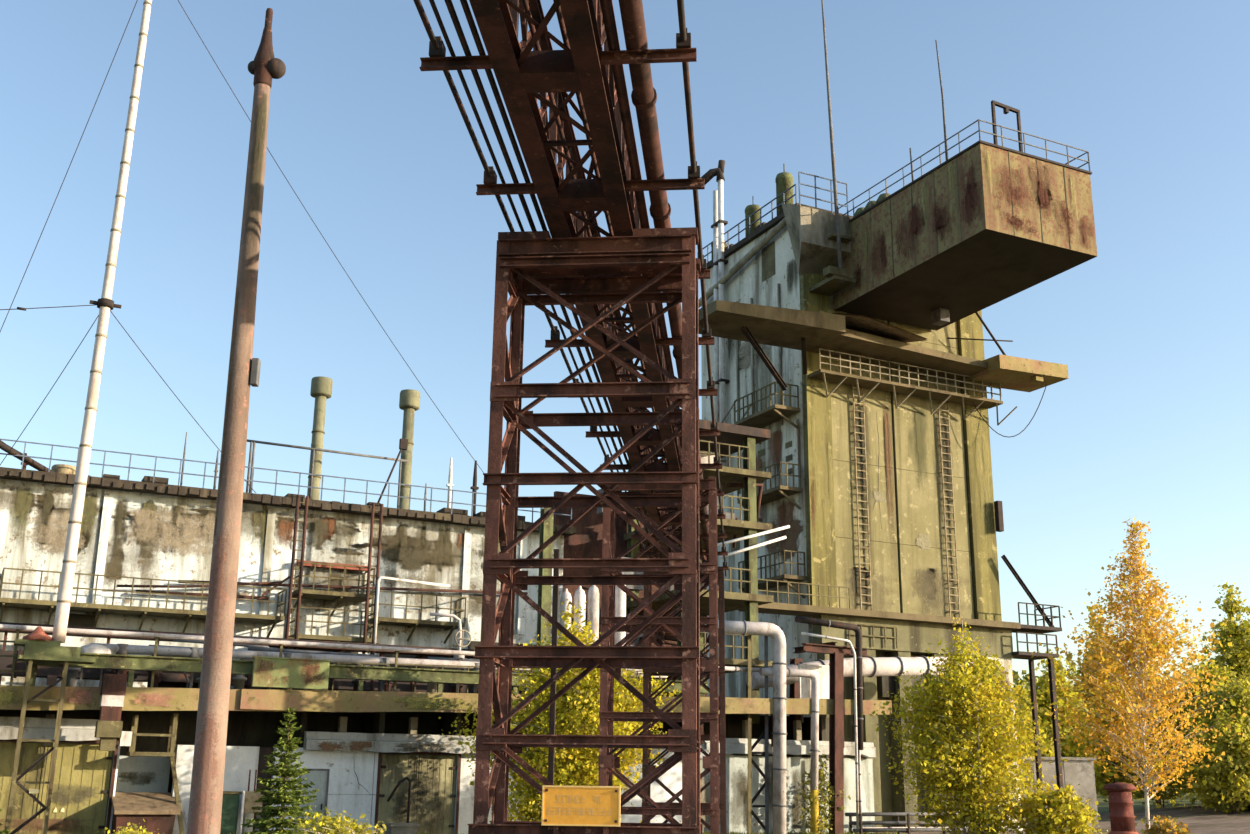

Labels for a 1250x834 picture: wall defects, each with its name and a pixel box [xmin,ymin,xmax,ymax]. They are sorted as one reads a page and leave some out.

damp [221,292,238,474]
corrosion [756,431,782,521]
damp [855,407,869,505]
damp [884,412,893,509]
damp [909,408,952,495]
damp [11,488,52,529]
damp [80,495,97,536]
damp [114,500,127,536]
damp [142,501,156,540]
damp [254,510,267,549]
corrosion [778,501,793,536]